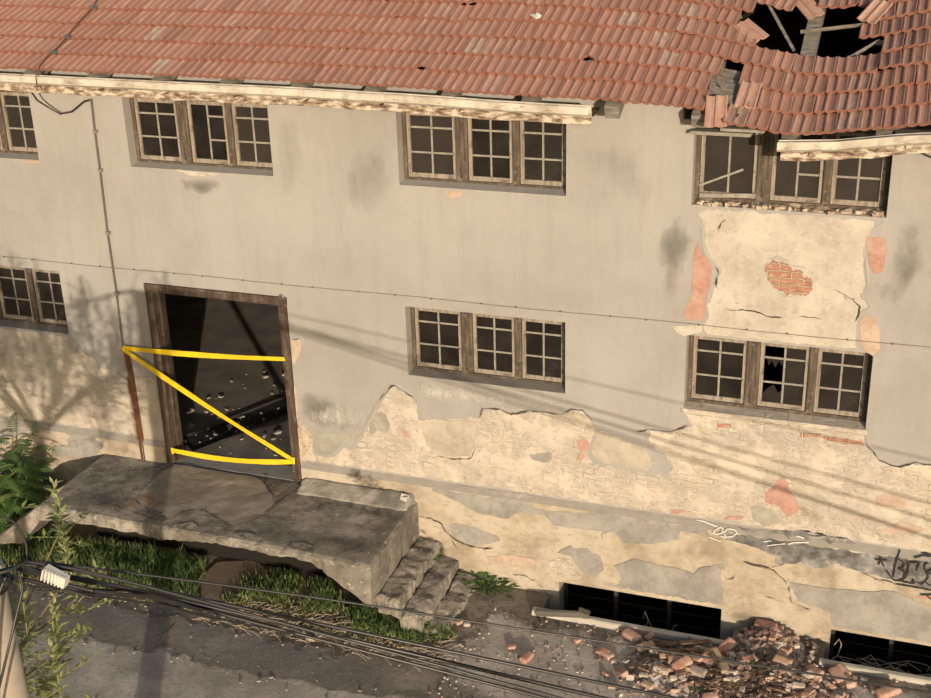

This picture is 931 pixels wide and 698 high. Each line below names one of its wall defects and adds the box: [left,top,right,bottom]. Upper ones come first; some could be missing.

crack [728,302,819,319]
peeling [673,209,887,356]
peeling [0,328,166,458]
crack [97,470,297,543]
peeling [294,382,931,644]